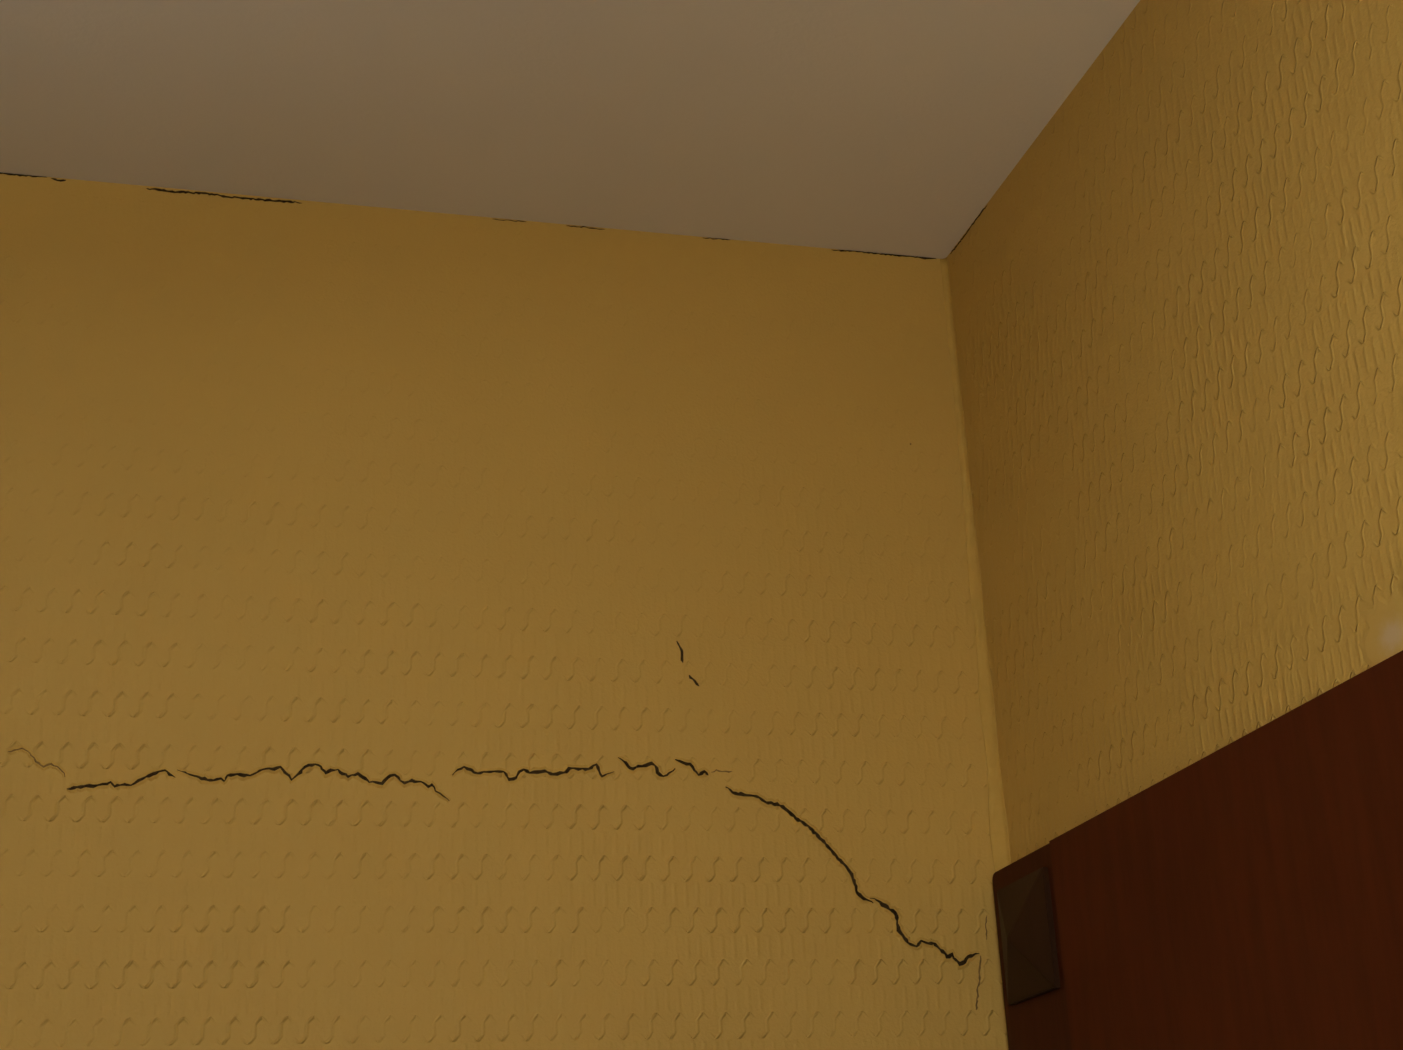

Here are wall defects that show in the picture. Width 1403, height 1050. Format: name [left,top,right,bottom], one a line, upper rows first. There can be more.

crack [676,641,699,686]
crack [0,745,980,970]